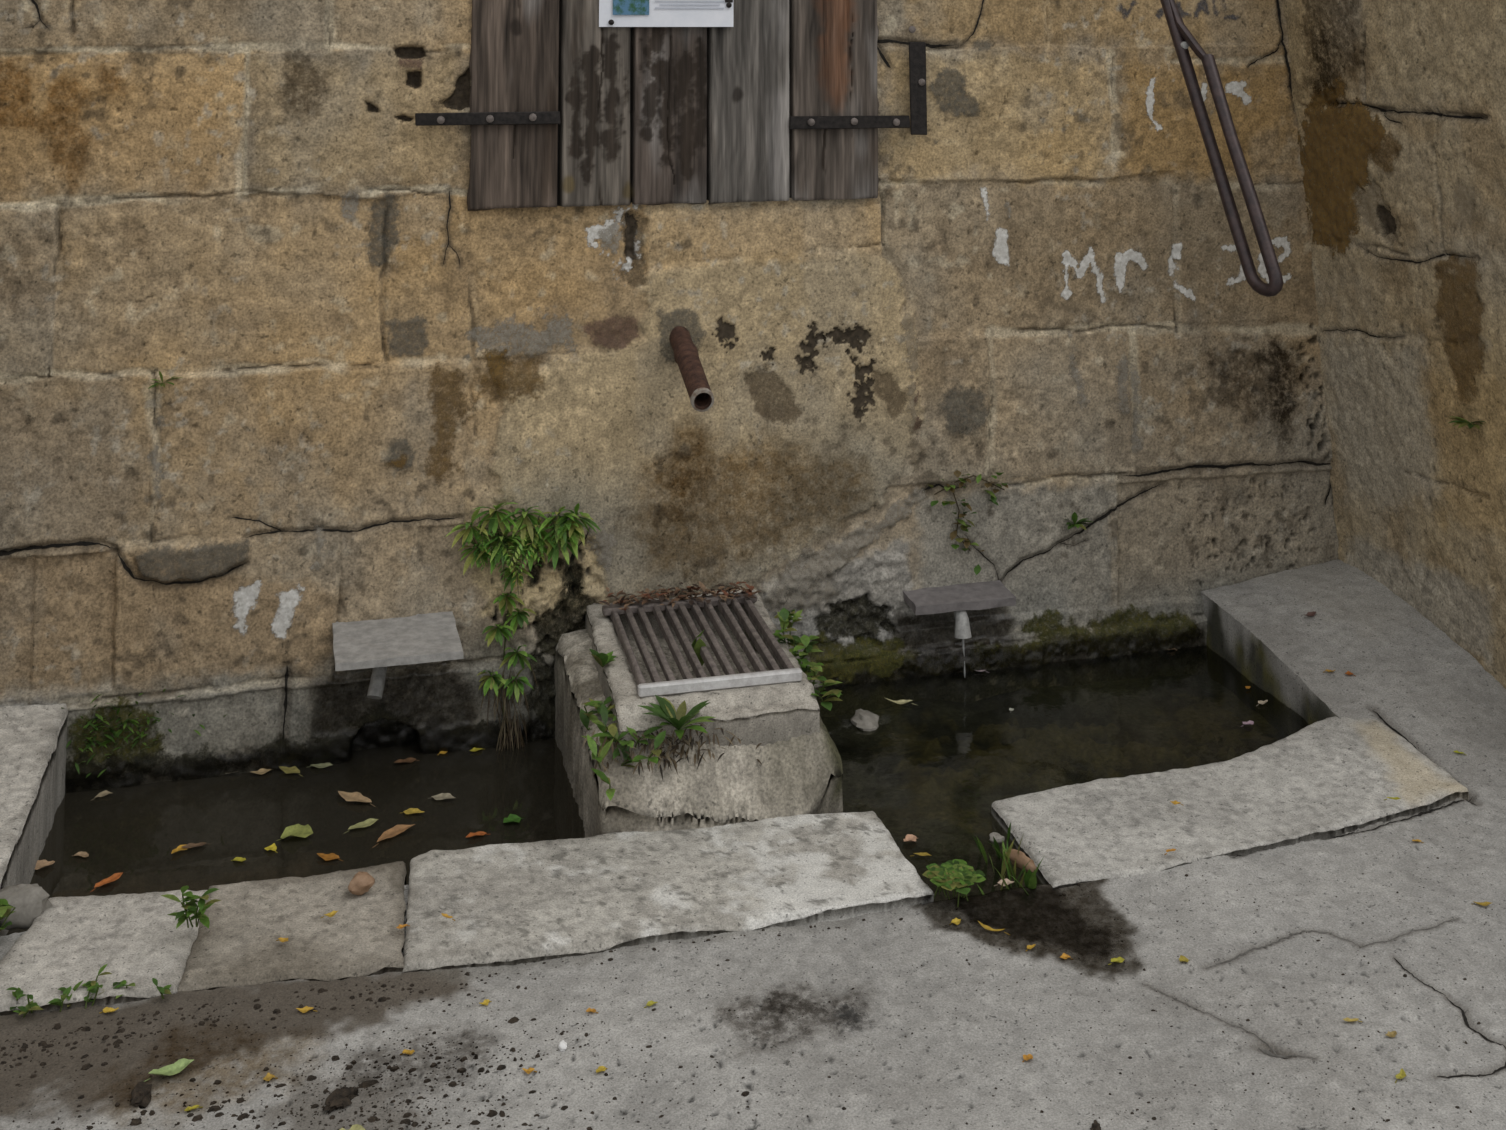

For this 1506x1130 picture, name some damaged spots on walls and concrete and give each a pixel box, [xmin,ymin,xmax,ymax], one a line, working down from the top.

spalling [599,212,647,287]
spalling [584,315,638,349]
crack [0,517,458,585]
crack [964,461,1331,580]
damp [917,879,1141,975]
crack [1147,985,1316,1059]
crack [1206,917,1506,1078]